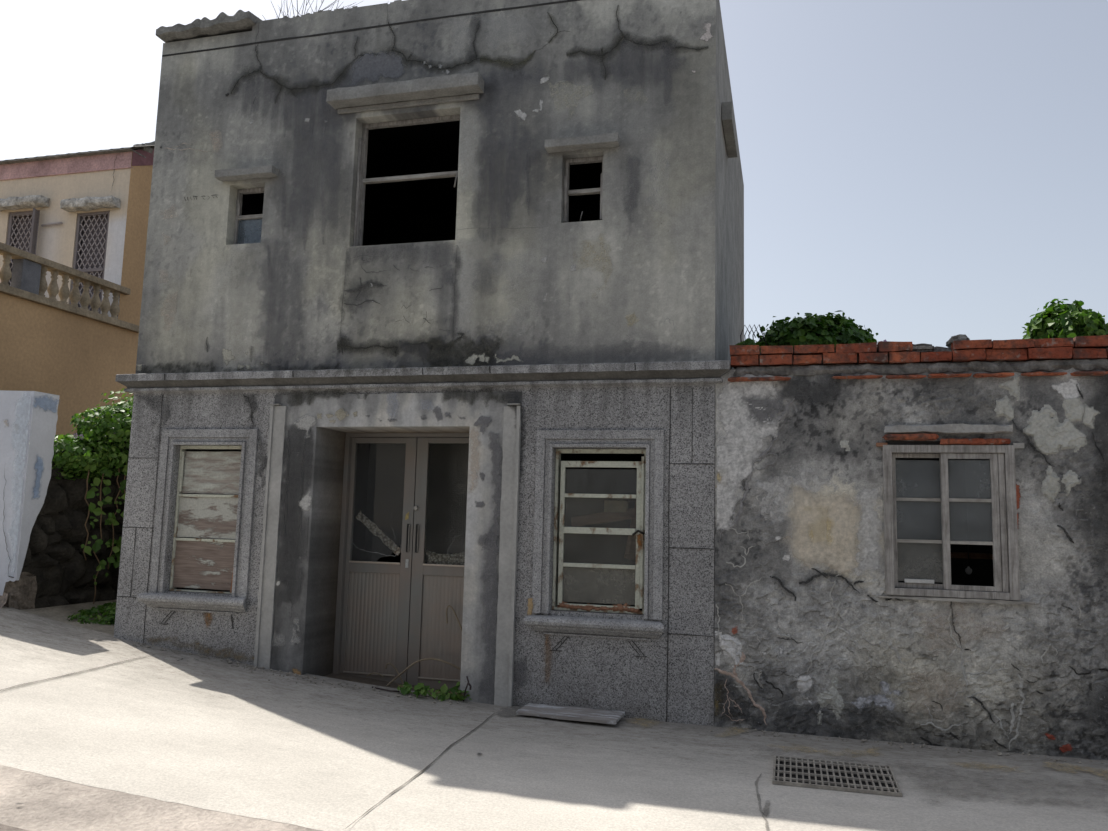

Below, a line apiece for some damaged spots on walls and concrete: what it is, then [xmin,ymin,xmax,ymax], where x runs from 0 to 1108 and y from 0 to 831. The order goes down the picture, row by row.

crack [230,4,709,104]
crack [337,228,471,351]
crack [3,467,14,578]
leakage [278,424,314,602]
leakage [478,432,503,698]
peeling [465,353,520,365]
leakage [507,397,524,481]
peeling [717,376,778,530]
crack [714,398,803,725]
crack [950,601,971,651]
crack [865,611,1058,750]
peeling [1052,379,1100,429]